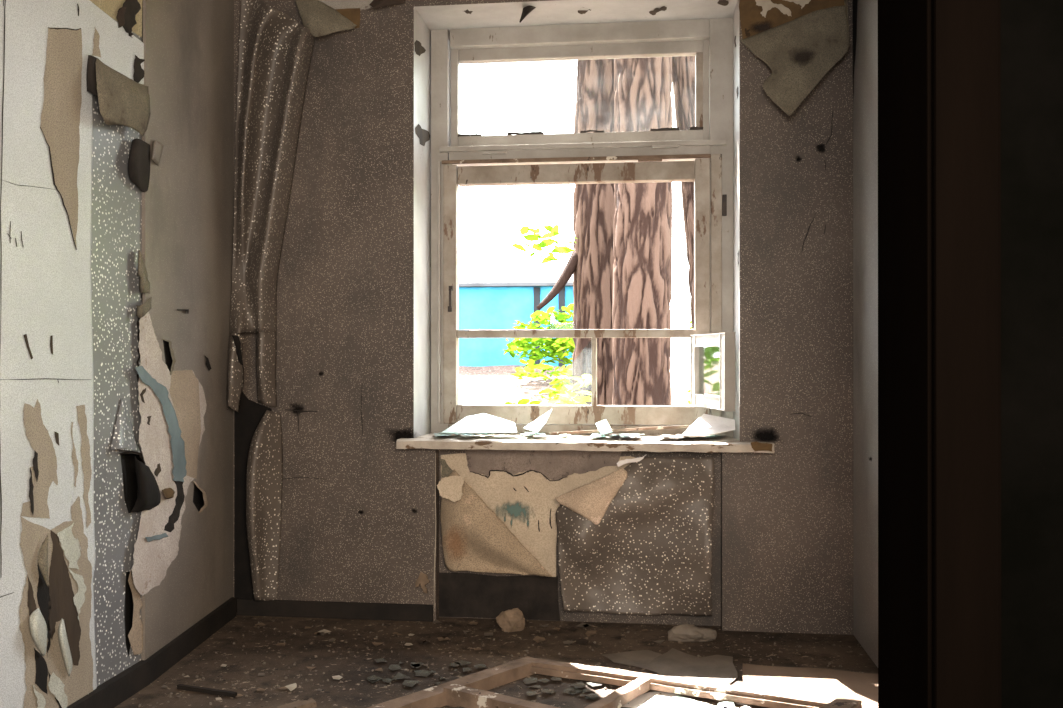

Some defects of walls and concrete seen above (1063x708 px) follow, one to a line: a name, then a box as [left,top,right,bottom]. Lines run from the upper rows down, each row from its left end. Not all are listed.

flaking render [319,0,373,28]
peeling [40,27,101,250]
peeling [19,399,93,708]
flaking render [119,312,208,596]
flaking render [441,449,635,577]